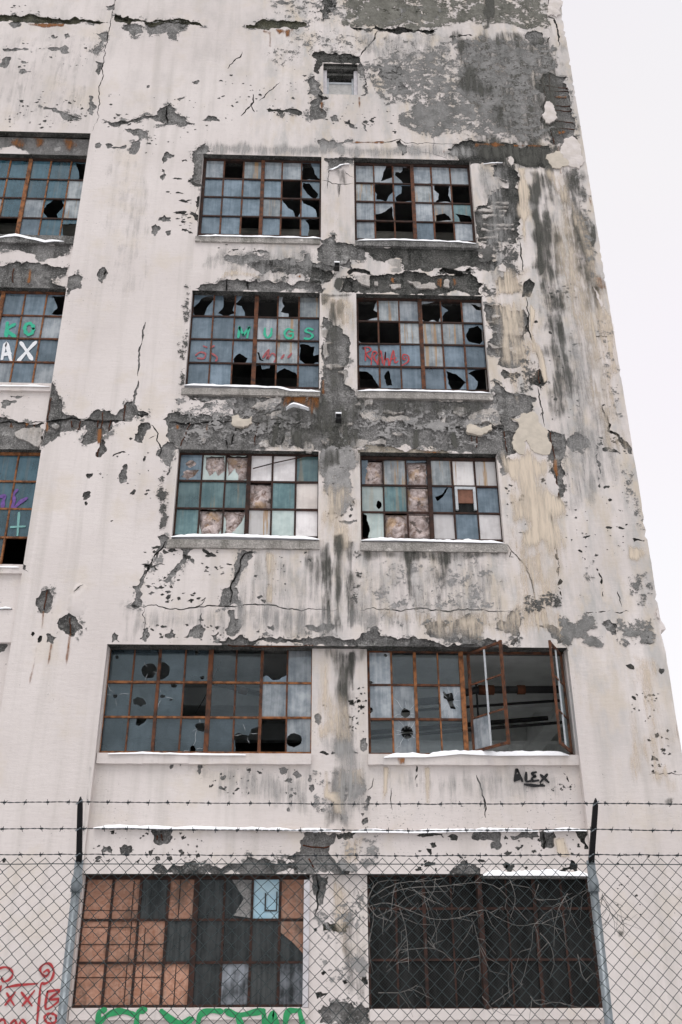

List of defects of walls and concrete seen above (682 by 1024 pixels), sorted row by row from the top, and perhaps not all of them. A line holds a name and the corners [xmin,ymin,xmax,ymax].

crack [93,1,127,129]
damp [213,0,617,492]
crack [131,322,162,456]
peeling [0,0,656,662]
crack [127,600,327,629]
damp [317,489,362,632]
damp [404,552,479,594]
damp [319,652,362,821]
spalling [93,767,380,943]